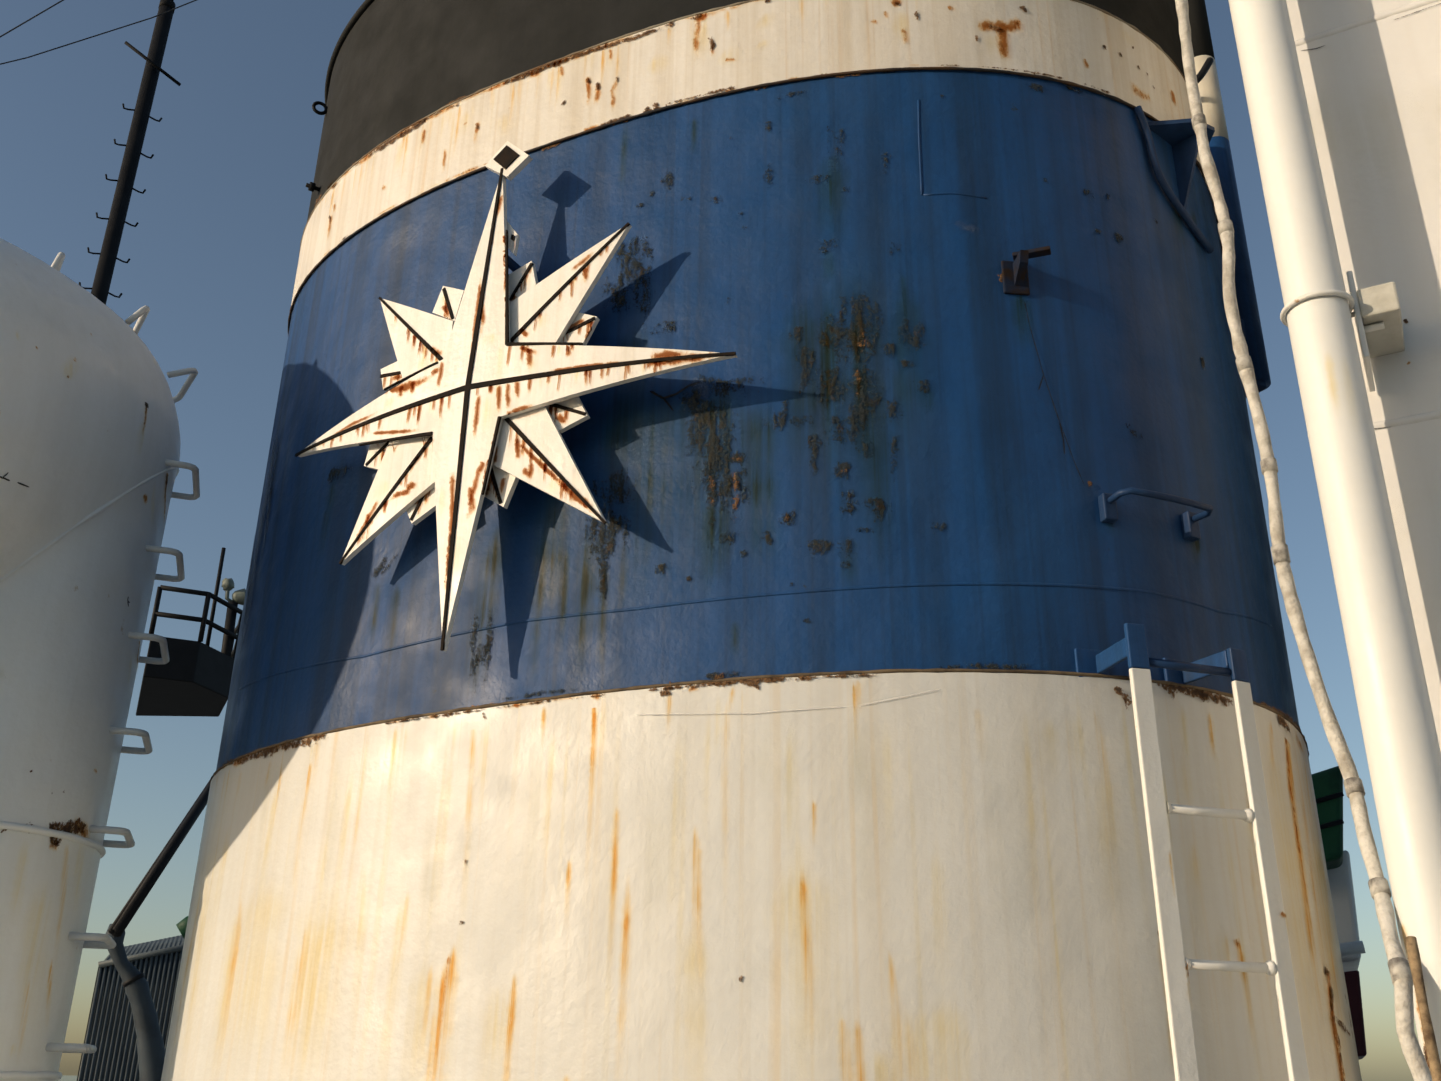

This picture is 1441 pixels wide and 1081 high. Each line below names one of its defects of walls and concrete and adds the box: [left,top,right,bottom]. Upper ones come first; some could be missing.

rust [691,14,734,61]
rust [975,6,1063,79]
rust [585,77,735,134]
rust [315,22,674,241]
rust [385,689,574,724]
rust [649,671,871,697]
rust [941,662,1026,670]
rust [1157,683,1233,706]
rust [31,818,88,849]
rust [1325,967,1353,1081]